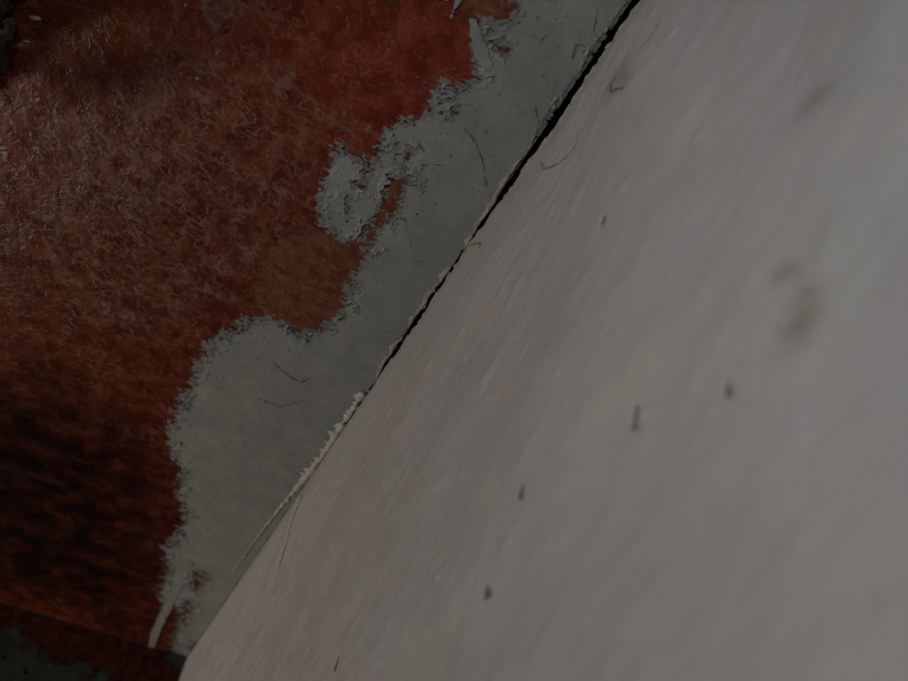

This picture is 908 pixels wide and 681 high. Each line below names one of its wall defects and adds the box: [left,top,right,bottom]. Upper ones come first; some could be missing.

peeling [148,0,631,656]
crack [233,0,642,572]